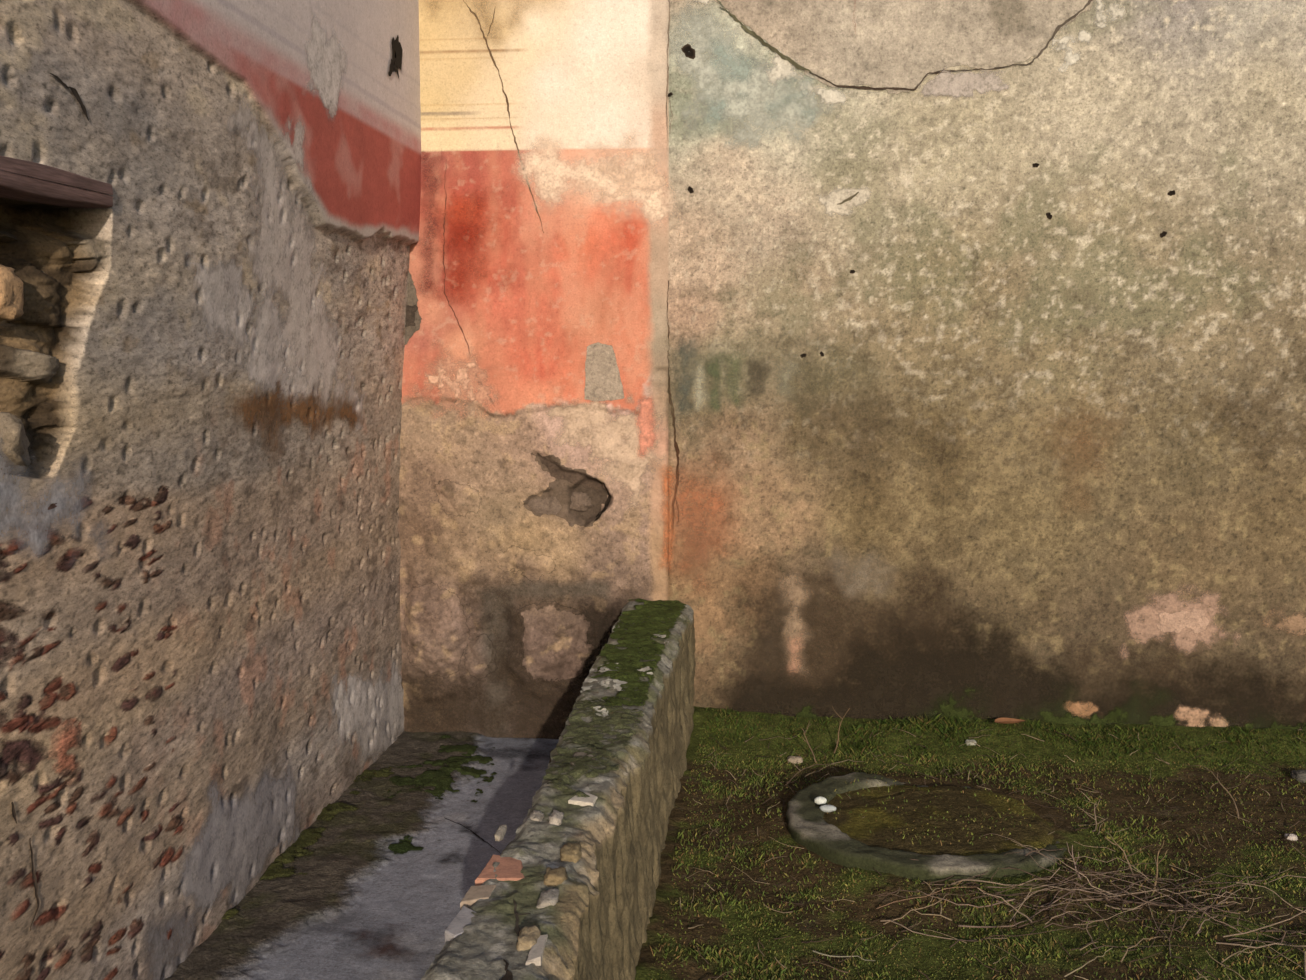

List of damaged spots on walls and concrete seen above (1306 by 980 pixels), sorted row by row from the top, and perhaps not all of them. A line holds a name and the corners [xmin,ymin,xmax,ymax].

flaking render [306,17,346,117]
crack [463,0,544,233]
peeling [519,140,674,222]
flaking render [186,101,363,429]
flaking render [404,270,422,345]
crack [443,159,494,405]
flaking render [332,342,662,760]
damp [733,560,1306,730]
flaking render [1122,593,1240,658]
flaking render [1263,611,1306,636]
crack [445,818,501,854]